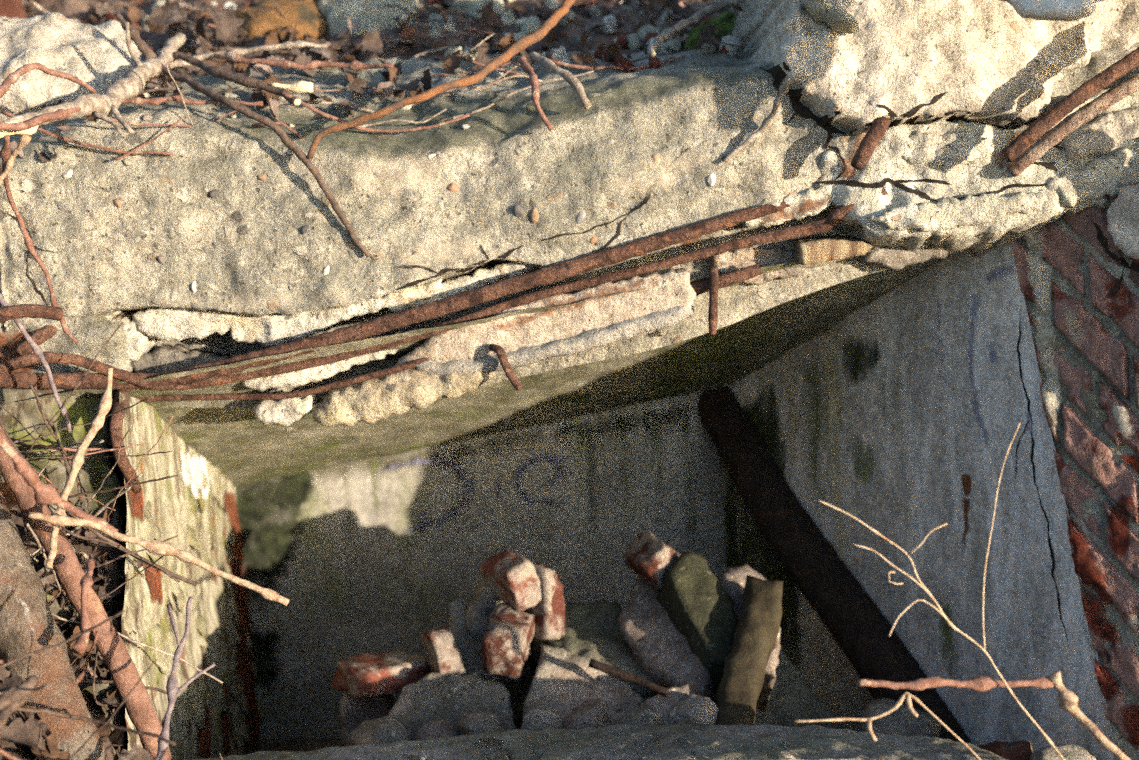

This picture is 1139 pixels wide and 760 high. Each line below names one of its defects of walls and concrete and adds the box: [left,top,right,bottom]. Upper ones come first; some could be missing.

spalling [382,159,433,192]
spalling [623,154,704,192]
spalling [850,116,890,171]
crack [760,62,1064,202]
spalling [859,47,1139,270]
crack [397,146,691,290]
corrosion [760,199,827,228]
corrosion [520,294,591,323]
water stain [181,453,210,500]
spalling [0,185,854,758]
corrosion [961,475,971,544]